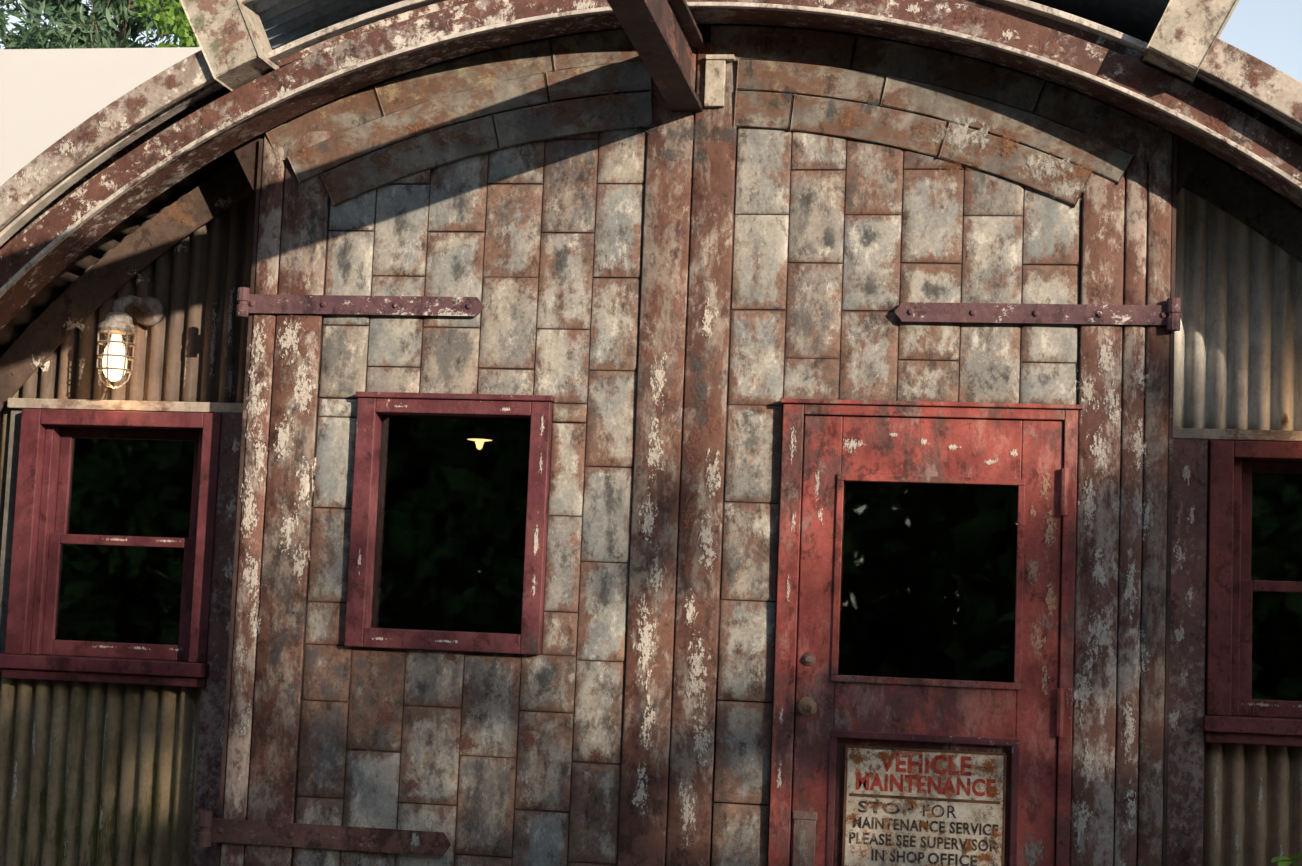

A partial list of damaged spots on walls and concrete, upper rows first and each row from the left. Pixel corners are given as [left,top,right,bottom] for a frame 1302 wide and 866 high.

corrosion [124,96,150,110]
corrosion [163,74,183,89]
peeling [702,298,719,337]
peeling [210,284,316,679]
peeling [1075,333,1121,527]
peeling [1128,416,1151,541]
peeling [632,352,668,815]
peeling [679,781,697,848]
peeling [684,448,722,767]
peeling [1027,560,1058,694]
peeling [1067,604,1113,853]
peeling [1121,558,1150,762]